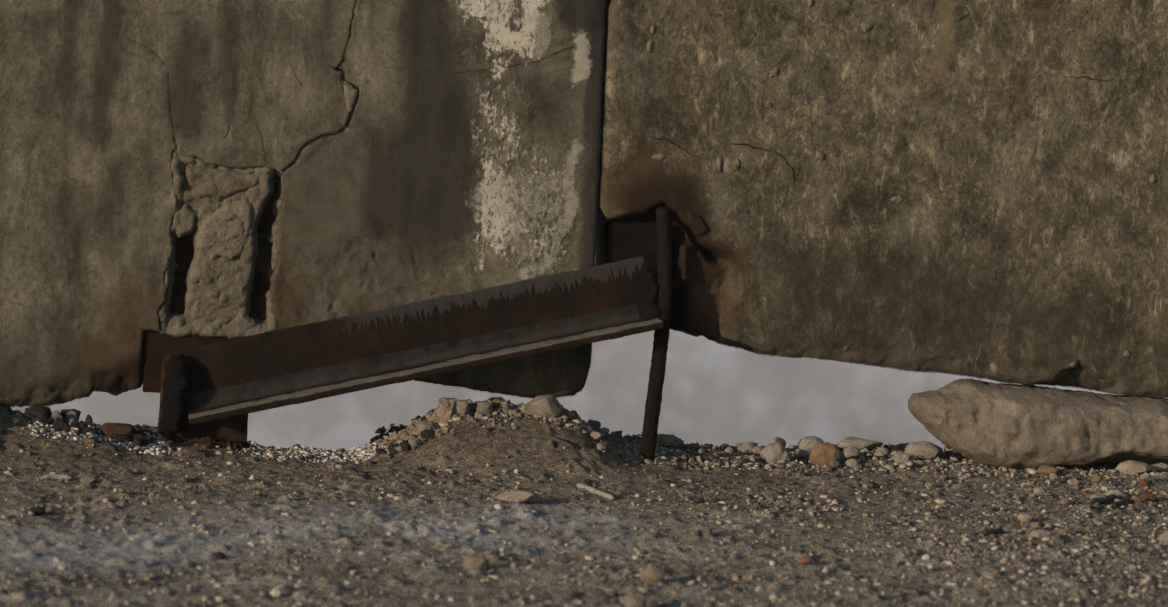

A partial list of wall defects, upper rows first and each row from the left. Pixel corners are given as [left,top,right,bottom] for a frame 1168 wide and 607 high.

crack [132,0,359,169]
leakage [503,0,606,280]
spalling [157,150,285,340]
corrosion [604,147,735,339]
leakage [581,343,592,361]